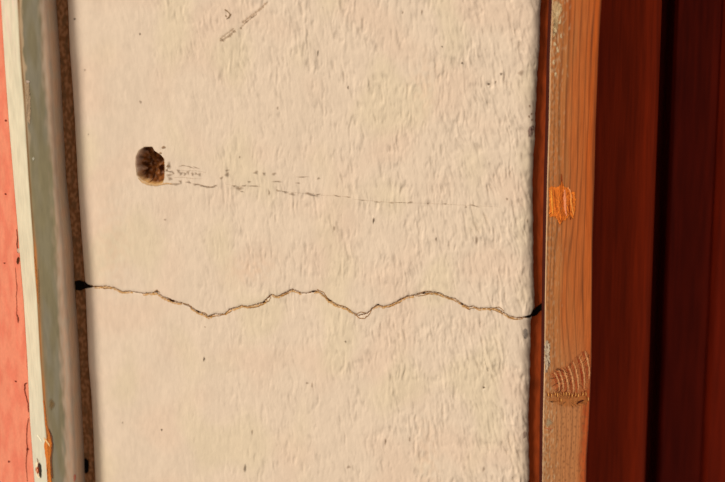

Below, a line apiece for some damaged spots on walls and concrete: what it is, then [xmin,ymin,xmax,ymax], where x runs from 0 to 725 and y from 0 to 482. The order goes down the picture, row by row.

crack [75,280,542,320]